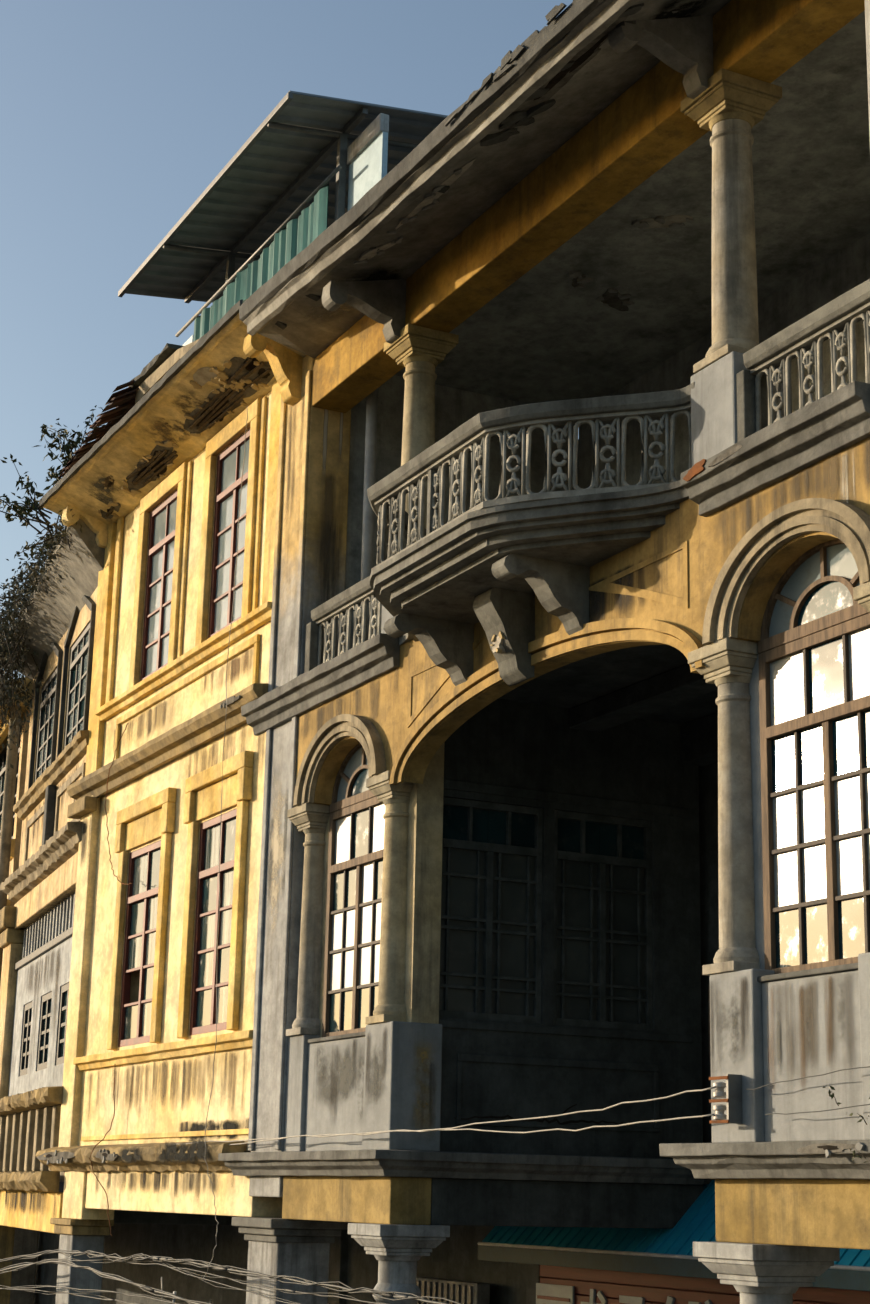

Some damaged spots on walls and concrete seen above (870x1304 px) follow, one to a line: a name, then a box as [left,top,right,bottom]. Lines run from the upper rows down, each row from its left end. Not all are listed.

flaking render [190,360,269,409]
damp [126,1062,204,1100]
damp [224,1054,236,1101]
damp [318,1032,386,1102]
damp [119,1119,249,1193]